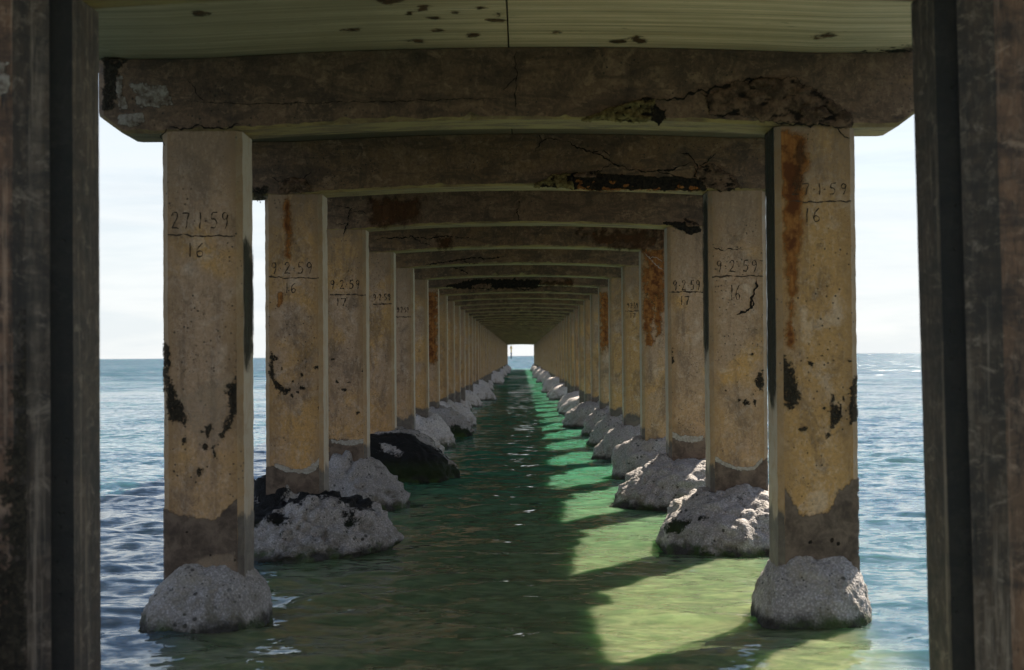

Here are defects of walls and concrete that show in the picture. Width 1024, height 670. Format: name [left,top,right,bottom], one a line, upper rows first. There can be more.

crack [160,51,518,146]
spalling [706,77,853,128]
crack [535,135,731,182]
spalling [571,164,742,192]
corrosion [781,130,810,348]
corrosion [428,291,438,364]
corrosion [575,227,665,350]
crack [737,279,758,315]
damp [163,338,187,444]
damp [823,375,858,439]
damp [163,499,238,580]
damp [785,478,860,573]